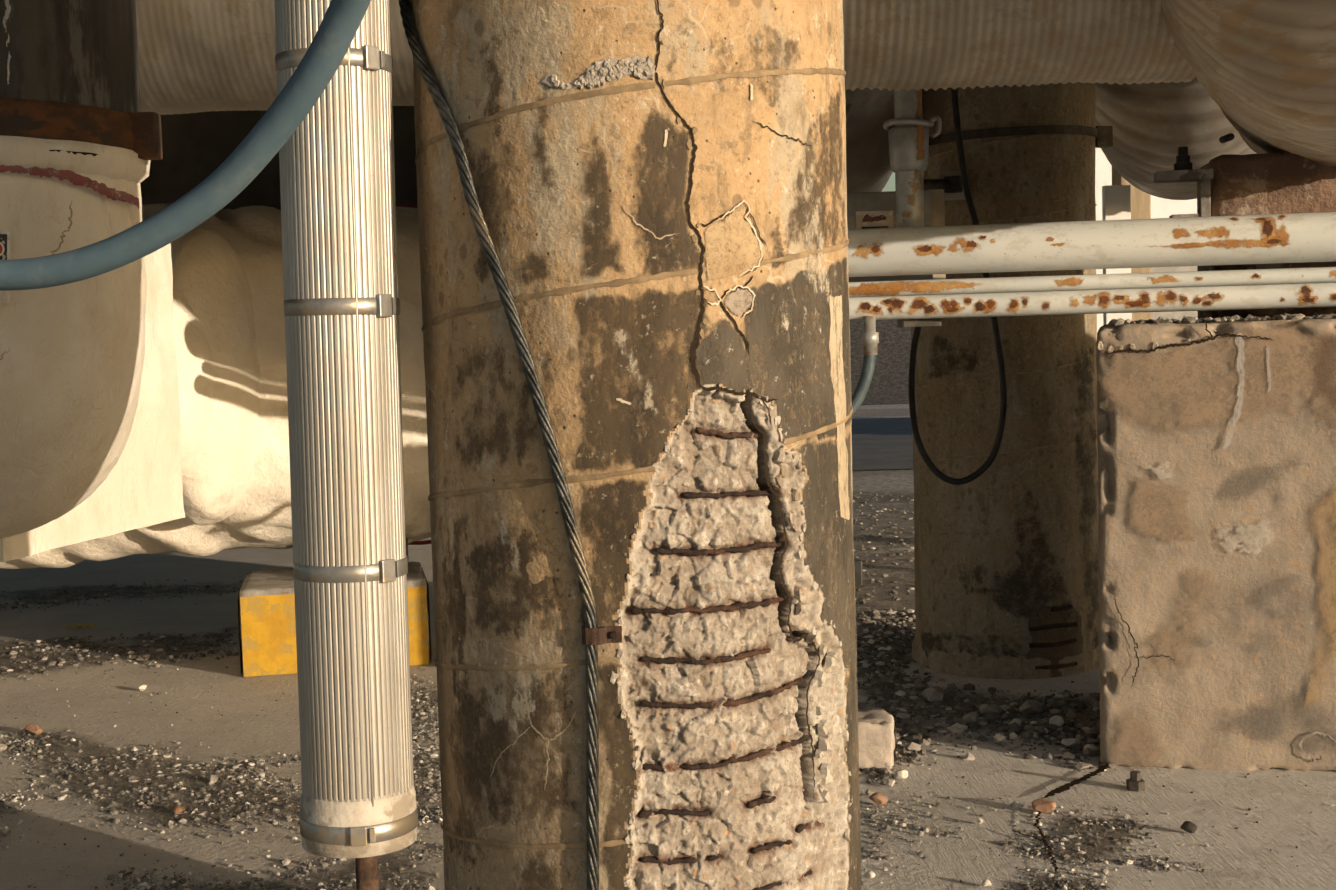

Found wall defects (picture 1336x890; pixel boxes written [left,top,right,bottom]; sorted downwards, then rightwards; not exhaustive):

spalling [542,55,656,89]
water stain [449,140,513,278]
water stain [535,98,555,186]
crack [623,0,820,806]
crack [1097,321,1272,355]
water stain [575,93,862,890]
water stain [1074,327,1336,648]
water stain [439,347,575,864]
spalling [610,382,852,890]
spalling [1026,603,1083,678]
crack [1114,594,1177,688]
crack [1012,764,1109,878]